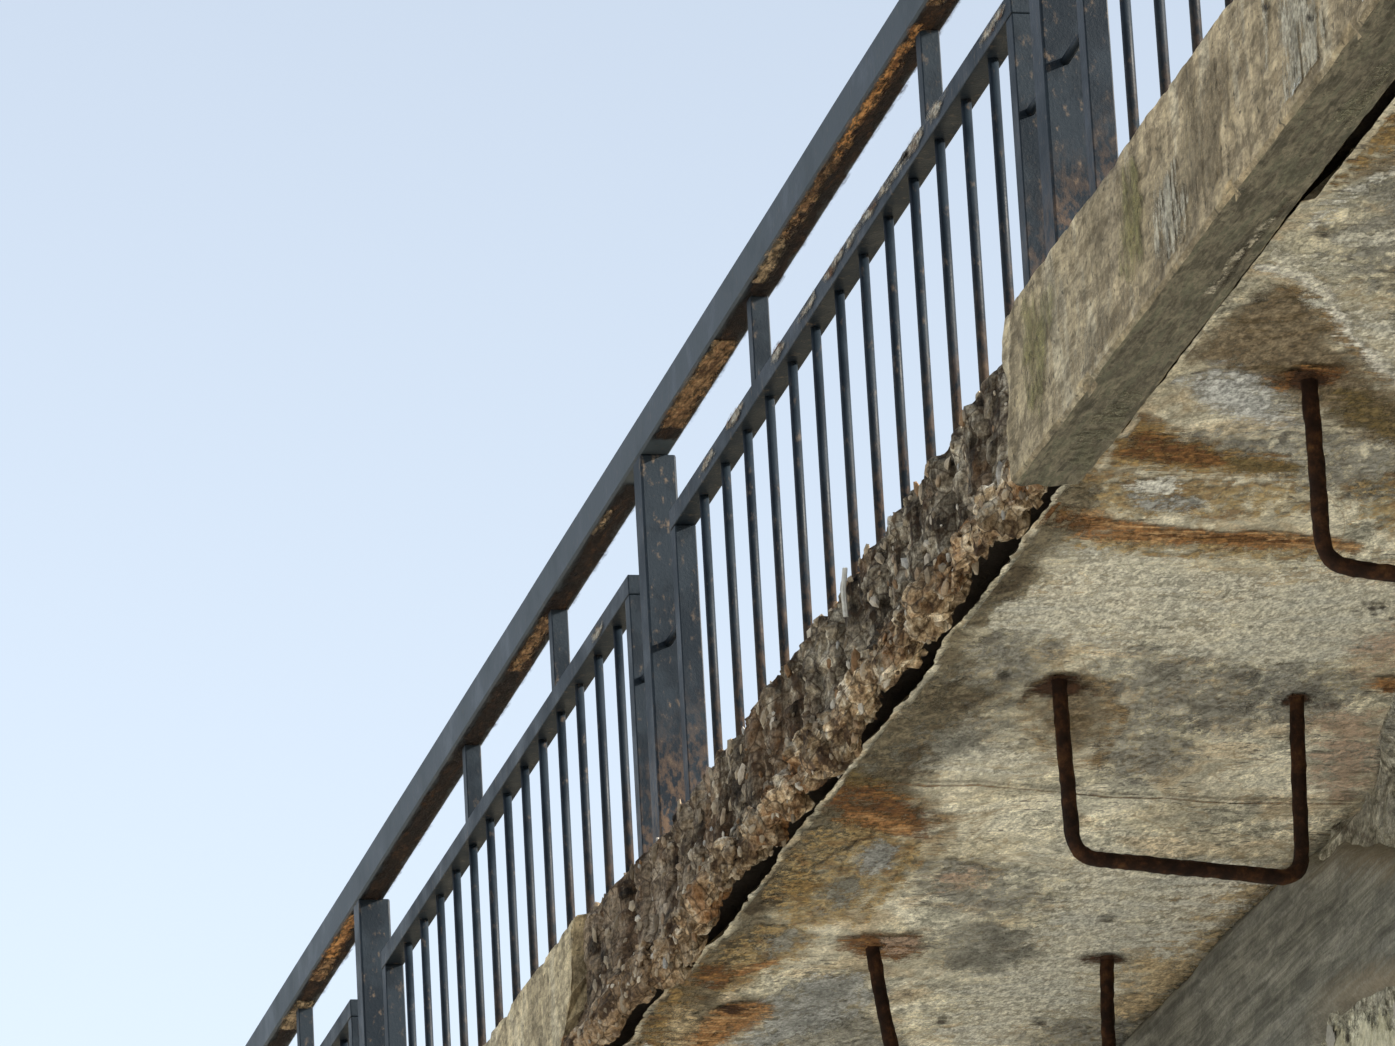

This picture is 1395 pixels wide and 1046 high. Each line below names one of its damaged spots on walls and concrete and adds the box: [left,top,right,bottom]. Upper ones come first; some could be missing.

rust [1094,414,1302,484]
rust [1262,364,1349,393]
water stain [635,158,1395,1046]
spalling [561,364,1048,1046]
rust [1022,675,1100,703]
rust [656,768,961,1046]
crack [812,831,863,872]
rust [1077,863,1292,1021]